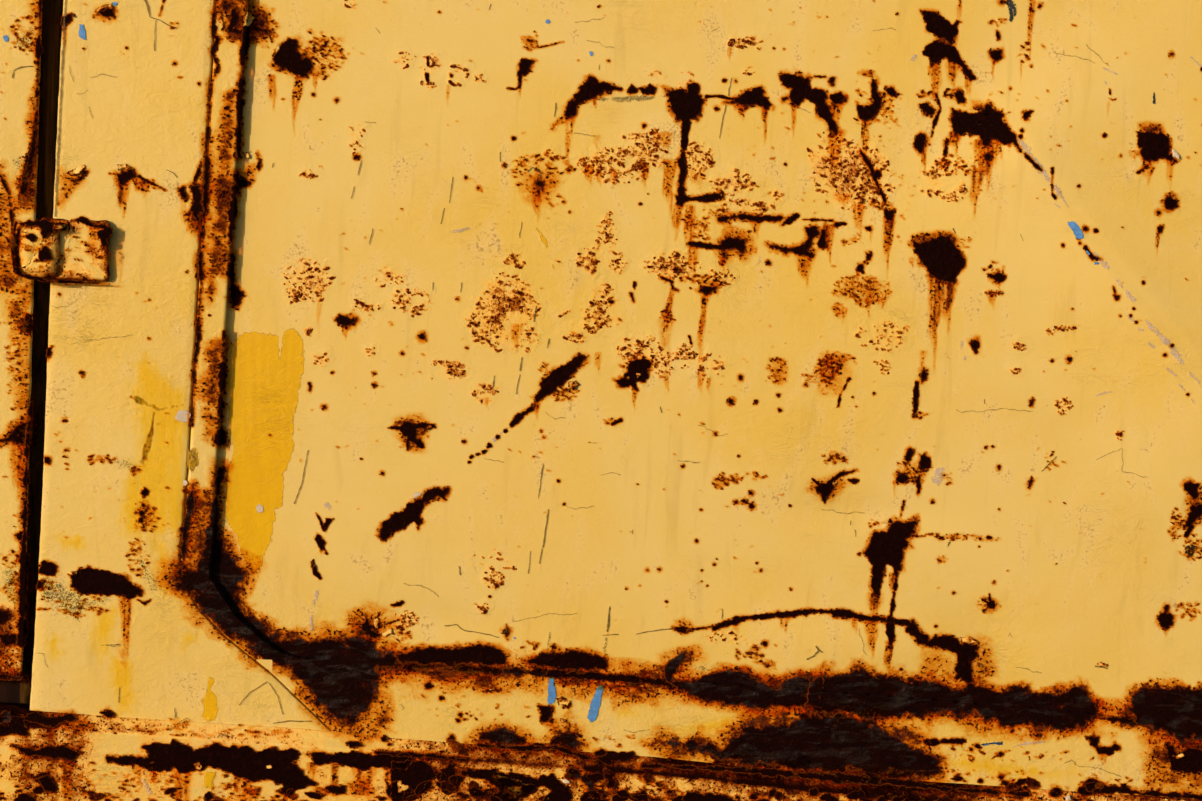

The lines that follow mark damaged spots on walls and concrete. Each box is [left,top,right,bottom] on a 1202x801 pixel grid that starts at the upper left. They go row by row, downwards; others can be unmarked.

rust [902,0,1060,208]
rust [108,0,349,448]
rust [502,28,971,419]
rust [983,261,1006,300]
rust [960,337,980,360]
rust [461,352,589,464]
rust [310,503,334,580]
rust [375,486,450,542]
rust [1168,479,1202,561]
rust [469,547,518,617]
rust [980,580,997,613]
rust [1156,603,1200,631]